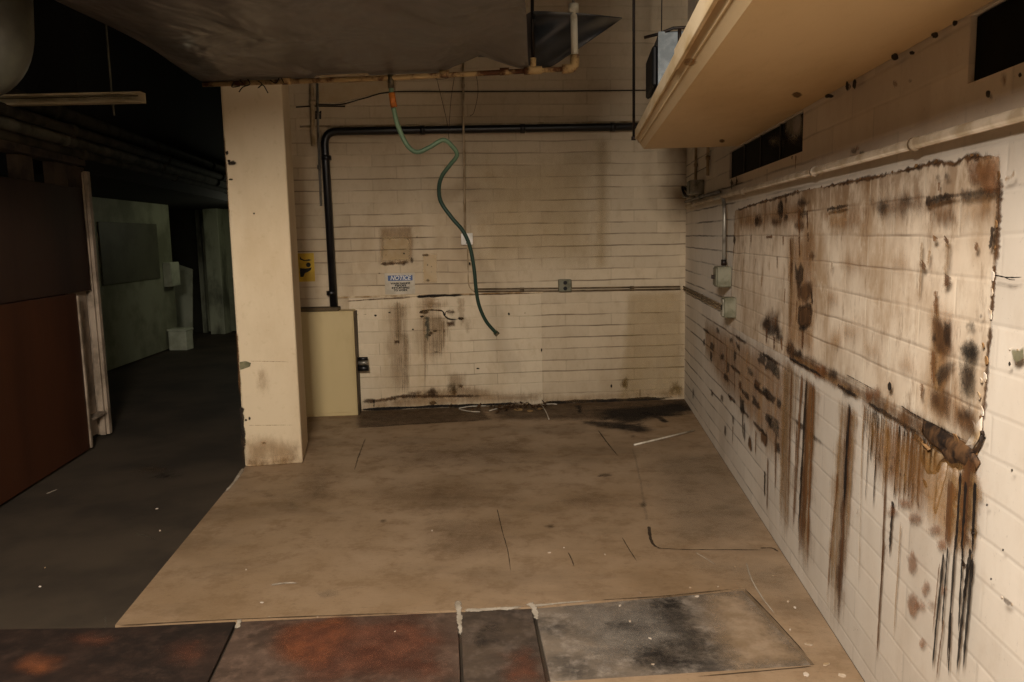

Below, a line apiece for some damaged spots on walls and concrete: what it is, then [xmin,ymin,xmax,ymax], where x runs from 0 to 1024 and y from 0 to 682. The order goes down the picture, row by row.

water stain [361,379,681,427]
rust [780,365,815,565]
rust [784,233,814,348]
peeling [729,153,1003,455]
rust [828,405,977,674]
rust [919,235,953,414]